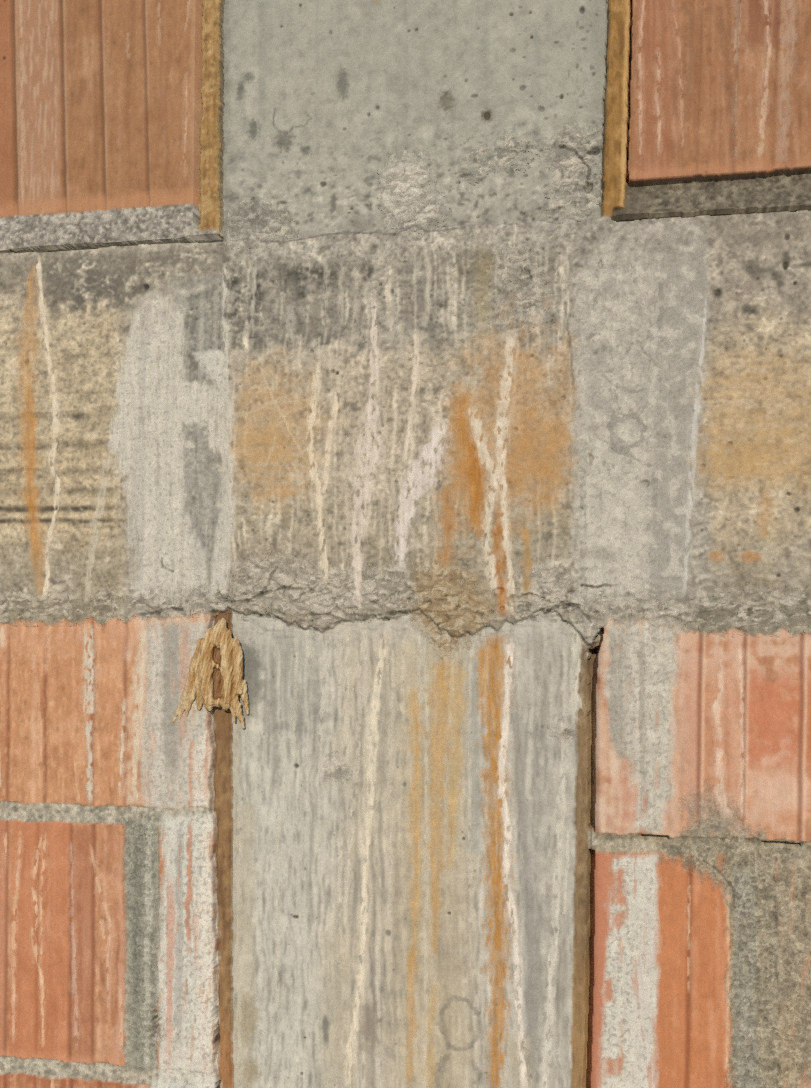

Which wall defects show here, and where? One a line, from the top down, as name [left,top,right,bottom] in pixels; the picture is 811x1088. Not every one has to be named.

corrosion [10,261,51,599]
damp [231,242,577,615]
corrosion [403,388,536,1088]